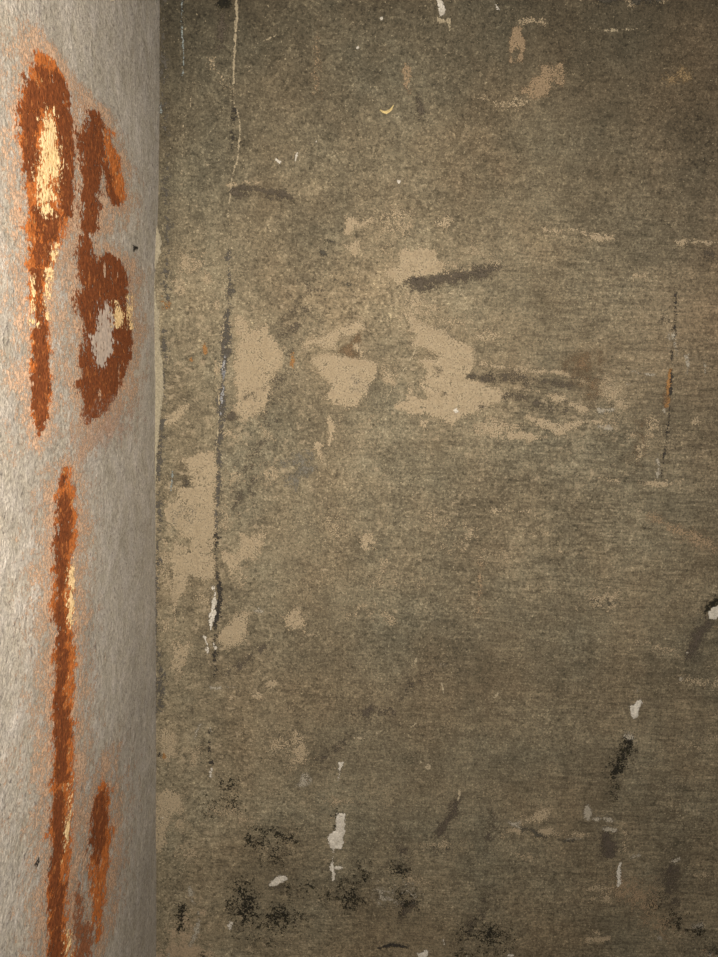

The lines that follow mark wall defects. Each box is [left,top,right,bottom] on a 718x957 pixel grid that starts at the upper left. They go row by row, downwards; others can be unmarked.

peeling [168,246,215,299]
crack [155,0,252,718]
peeling [214,312,286,443]
peeling [300,202,666,463]
corrosion [0,18,155,957]
peeling [156,445,283,681]
peeling [156,725,205,772]
crack [207,728,215,778]
leakage [199,774,246,818]
leakage [243,823,300,868]
leakage [173,886,202,947]
leakage [222,849,433,947]